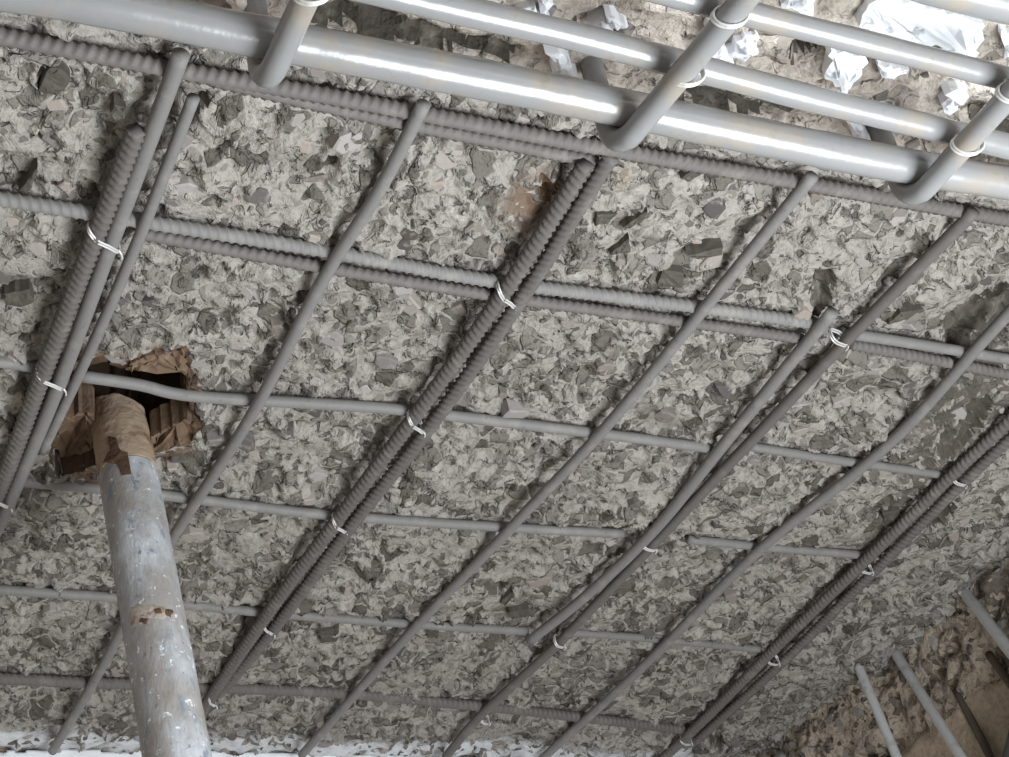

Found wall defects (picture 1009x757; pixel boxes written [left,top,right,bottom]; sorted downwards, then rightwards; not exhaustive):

spalling [0,46,163,206]
spalling [0,12,250,75]
spalling [310,0,552,72]
spalling [283,65,600,140]
spalling [489,0,705,50]
spalling [677,82,853,137]
spalling [639,133,891,192]
spalling [725,26,995,123]
spalling [976,20,1009,66]
spalling [542,160,792,301]
spalling [0,80,574,755]
spalling [205,190,1009,757]